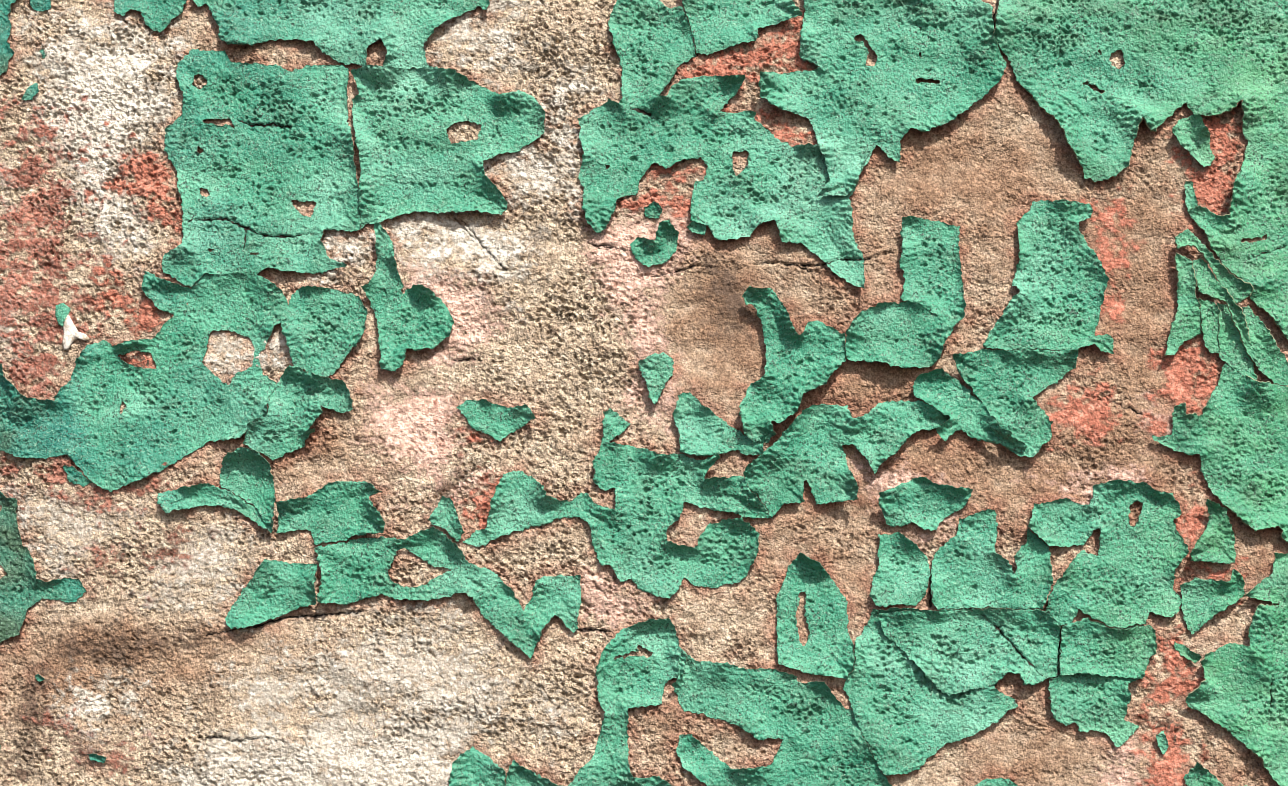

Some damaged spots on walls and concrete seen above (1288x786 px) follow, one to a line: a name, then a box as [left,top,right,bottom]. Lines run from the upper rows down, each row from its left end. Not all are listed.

peeling [0,451,362,786]
peeling [0,0,387,401]
peeling [157,0,1178,786]
crack [757,252,901,272]
peeling [1028,320,1288,786]
peeling [1108,101,1248,216]
peeling [1161,211,1222,281]
peeling [1195,287,1288,362]